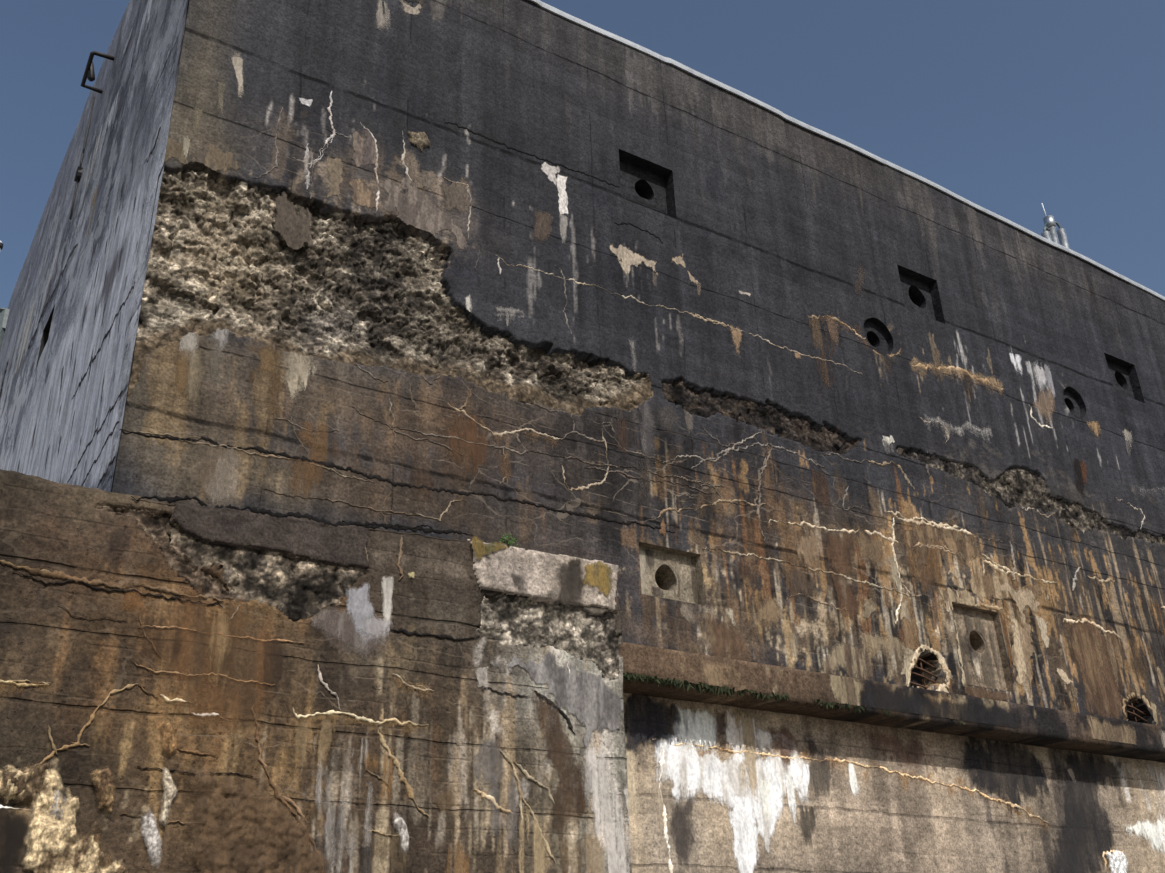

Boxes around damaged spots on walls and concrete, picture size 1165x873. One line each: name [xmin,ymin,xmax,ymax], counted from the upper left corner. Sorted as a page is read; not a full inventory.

crack [254,91,412,213]
spalling [128,130,860,454]
crack [444,177,862,374]
spalling [476,574,623,747]
crack [67,364,1115,624]
corrosion [701,622,747,687]
corrosion [747,519,898,581]
corrosion [821,634,906,680]
peeling [896,516,1049,719]
leakage [0,762,128,873]
leakage [142,768,178,862]
leakage [624,694,834,873]